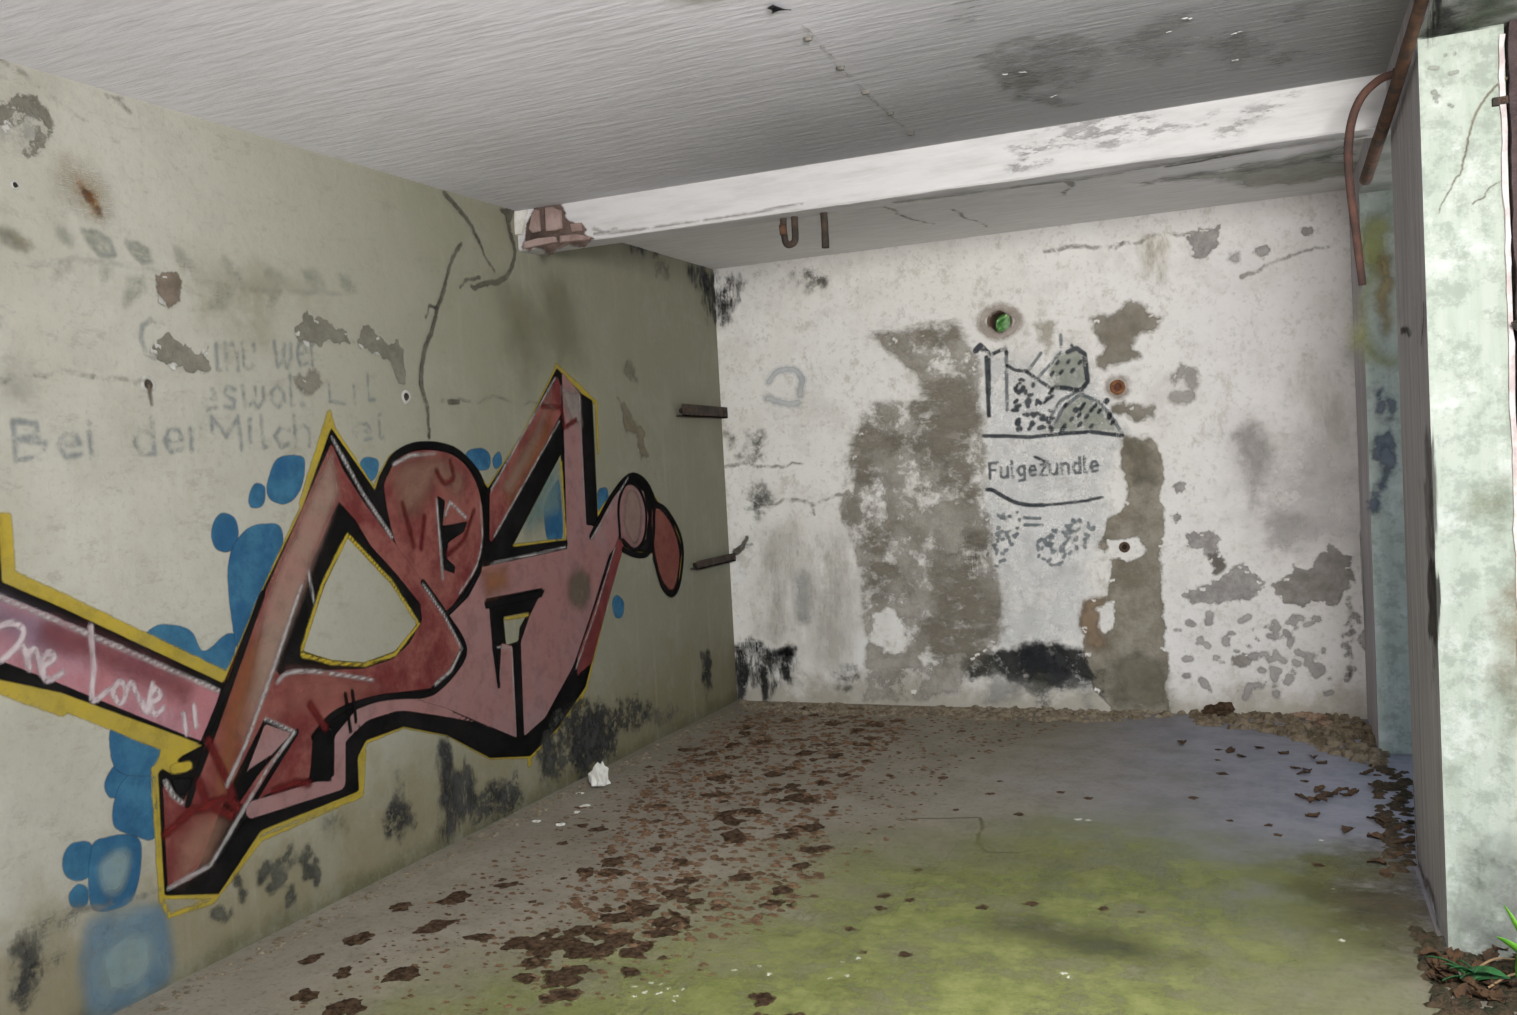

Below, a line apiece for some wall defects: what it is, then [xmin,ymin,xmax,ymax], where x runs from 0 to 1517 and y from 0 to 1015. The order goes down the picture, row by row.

peeling [0,94,53,159]
corrosion [72,178,101,216]
spalling [514,204,594,256]
peeling [156,272,182,308]
peeling [294,312,411,404]
crack [419,191,516,439]
peeling [1038,322,1053,346]
peeling [1092,301,1163,369]
peeling [841,326,1001,701]
peeling [1079,365,1365,712]
leakage [962,642,1103,704]
leakage [11,926,58,1010]